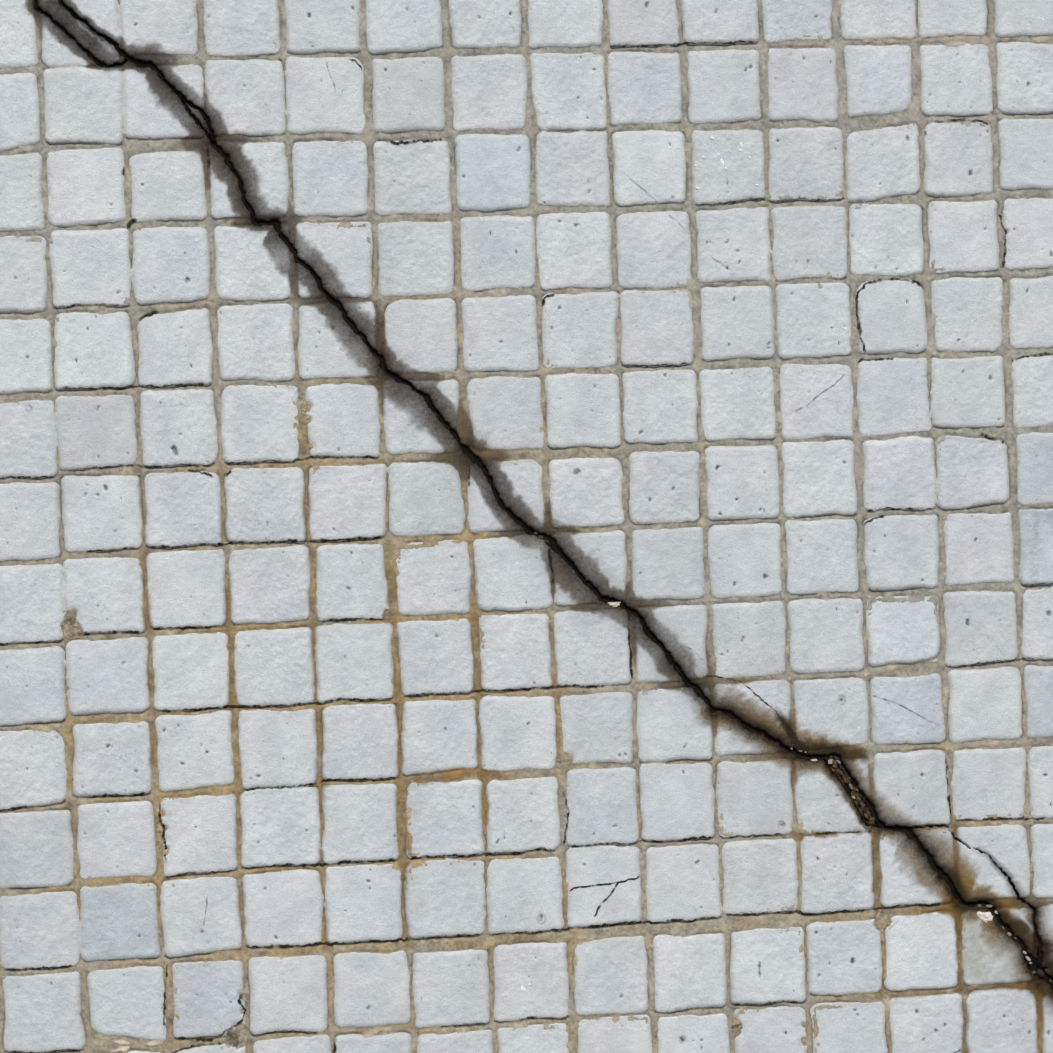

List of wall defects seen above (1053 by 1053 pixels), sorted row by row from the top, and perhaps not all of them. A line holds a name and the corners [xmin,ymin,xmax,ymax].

crack [821,278,922,393]
water stain [26,0,716,701]
crack [66,382,203,390]
crack [93,455,375,477]
crack [87,536,380,552]
crack [84,625,219,635]
crack [159,684,603,712]
crack [246,777,395,790]
crack [93,792,782,878]
crack [428,876,940,938]
crack [252,937,409,948]
crack [163,969,246,1053]